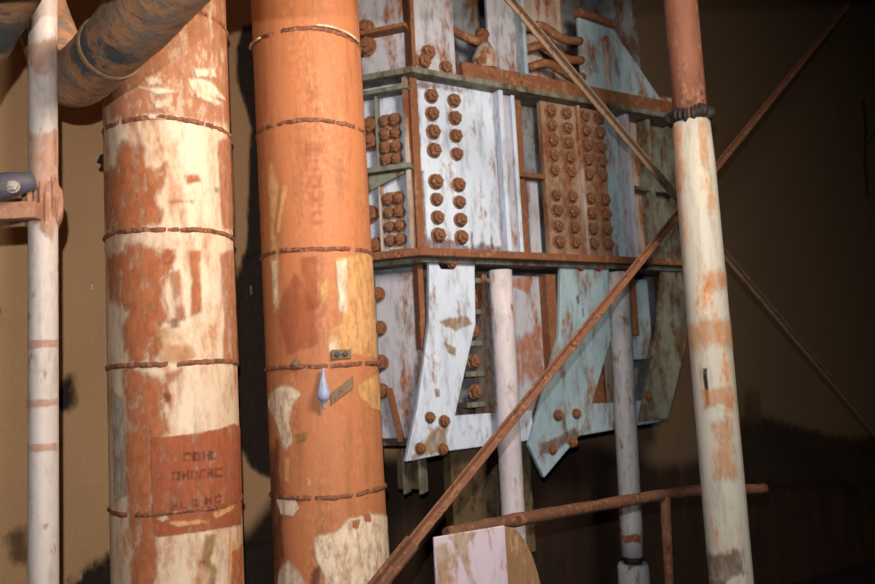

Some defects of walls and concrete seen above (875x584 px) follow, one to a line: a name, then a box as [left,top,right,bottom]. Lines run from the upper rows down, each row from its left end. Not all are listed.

corrosion [102,0,230,125]
corrosion [29,130,58,189]
corrosion [104,141,166,231]
corrosion [219,138,234,228]
corrosion [221,250,239,364]
corrosion [443,316,471,330]
corrosion [108,243,201,584]
peeling [268,385,307,482]
corrosion [232,544,243,584]
peeling [276,499,299,516]
peeling [278,560,305,584]
peeling [315,513,389,584]